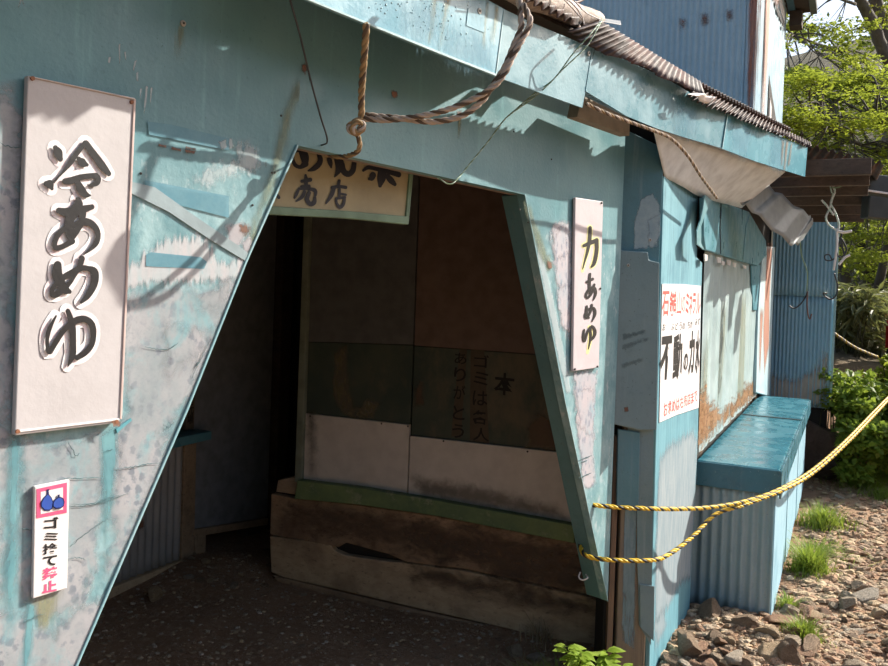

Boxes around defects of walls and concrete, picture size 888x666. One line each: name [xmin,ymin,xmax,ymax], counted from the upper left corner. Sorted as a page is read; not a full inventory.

corrosion [748,0,778,112]
peeling [634,194,661,249]
peeling [550,222,572,335]
peeling [0,90,251,666]
corrosion [698,382,755,447]
crack [64,449,159,479]
crack [70,493,128,559]